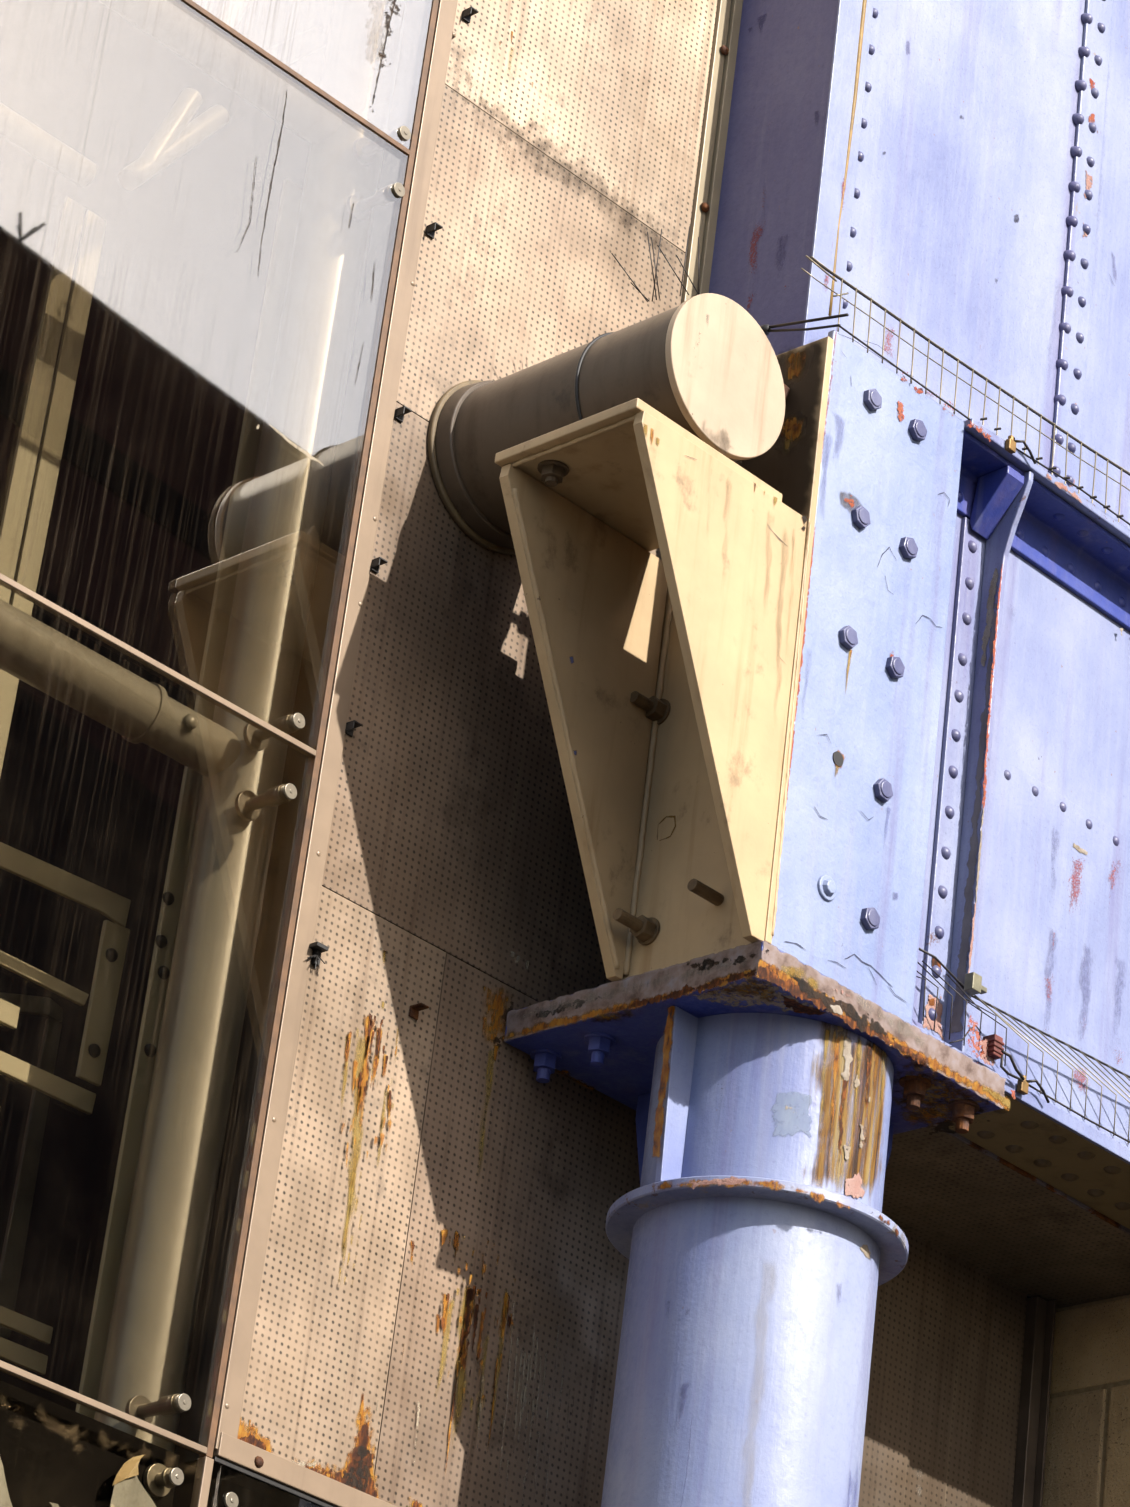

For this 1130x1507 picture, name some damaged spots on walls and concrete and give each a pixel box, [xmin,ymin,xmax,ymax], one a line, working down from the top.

rust [785,515,815,811]
rust [339,1002,398,1283]
rust [480,937,1016,1209]
rust [237,1418,272,1453]
rust [293,1394,378,1498]
rust [436,1229,516,1466]